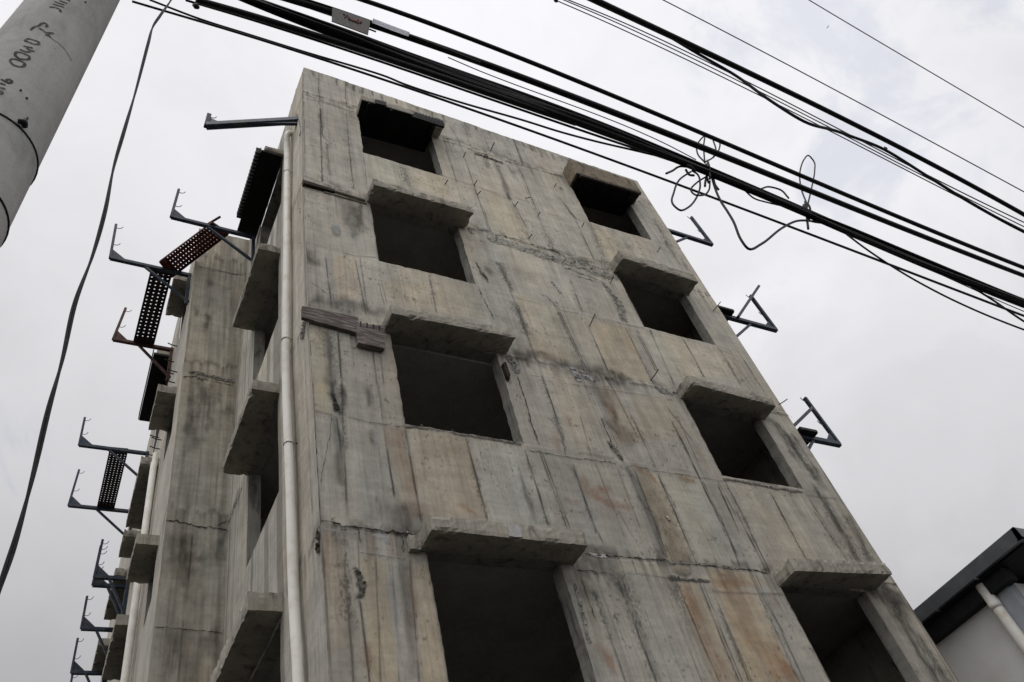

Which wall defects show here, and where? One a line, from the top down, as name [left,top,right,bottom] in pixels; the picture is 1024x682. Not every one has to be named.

spalling [487,234,628,322]
crack [304,350,415,559]
crack [168,487,242,531]
spalling [354,567,366,598]